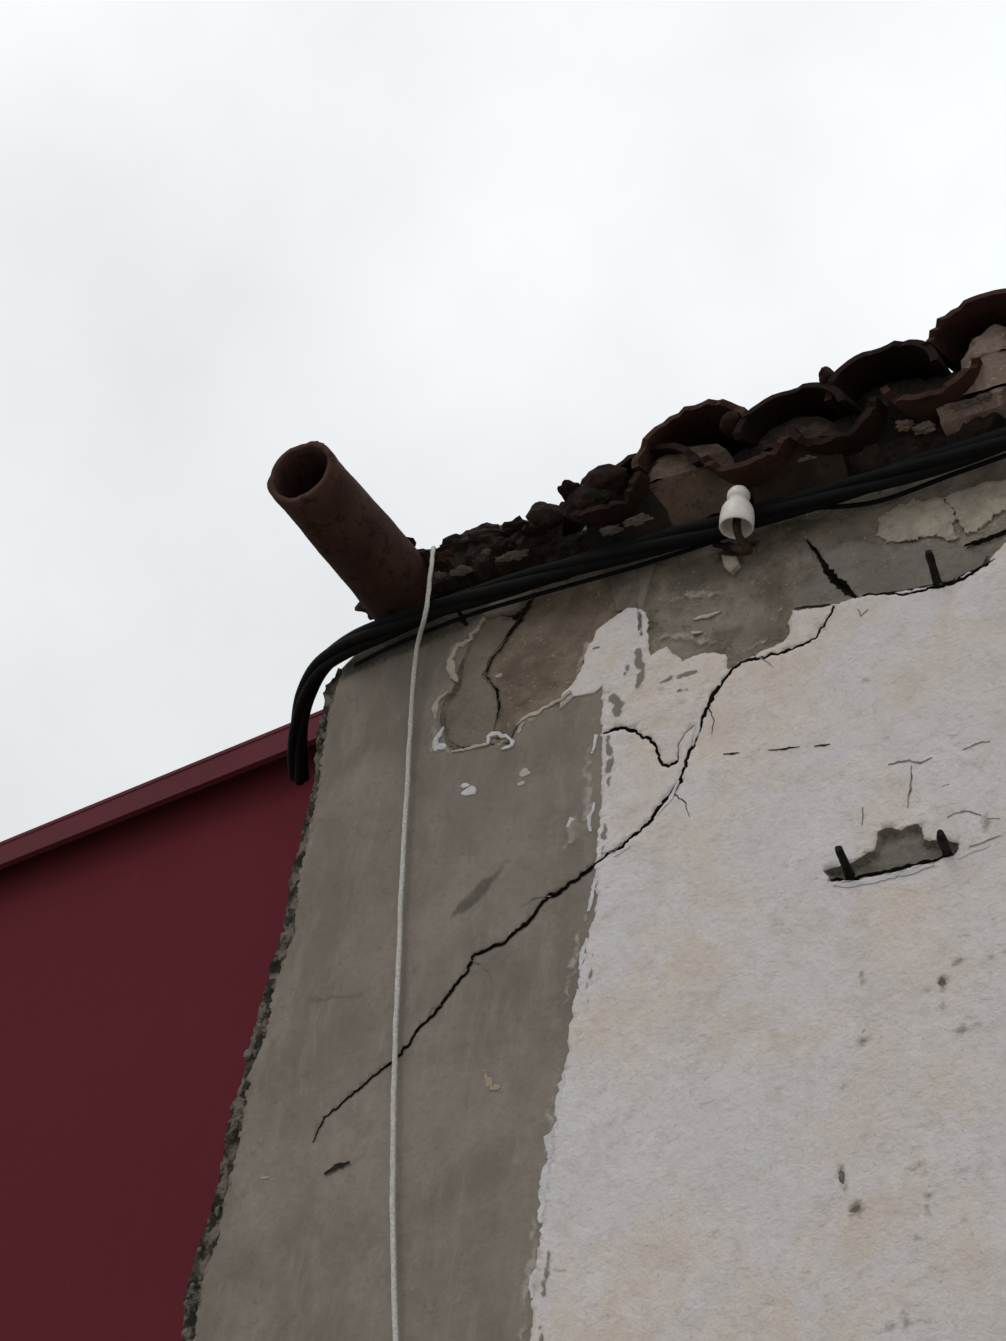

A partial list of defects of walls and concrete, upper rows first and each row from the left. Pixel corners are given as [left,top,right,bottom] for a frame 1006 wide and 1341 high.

peeling [564,734,614,854]
peeling [585,877,598,921]
crack [313,529,1006,1175]
spalling [823,824,990,888]
spalling [182,668,342,1341]
peeling [568,935,592,987]
peeling [522,1071,565,1304]